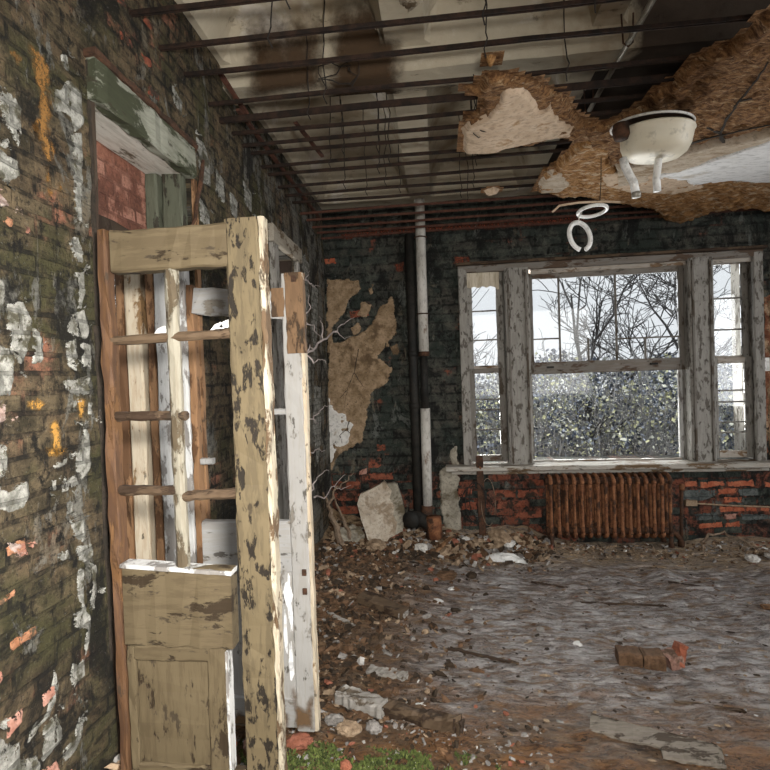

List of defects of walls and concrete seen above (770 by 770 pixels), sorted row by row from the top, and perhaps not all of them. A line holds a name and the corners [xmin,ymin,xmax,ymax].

leakage [250,24,319,95]
leakage [328,5,398,97]
peeling [0,87,23,215]
peeling [52,47,89,228]
peeling [302,255,399,470]
peeling [0,237,106,770]
spalling [332,462,393,514]
spalling [494,479,544,519]